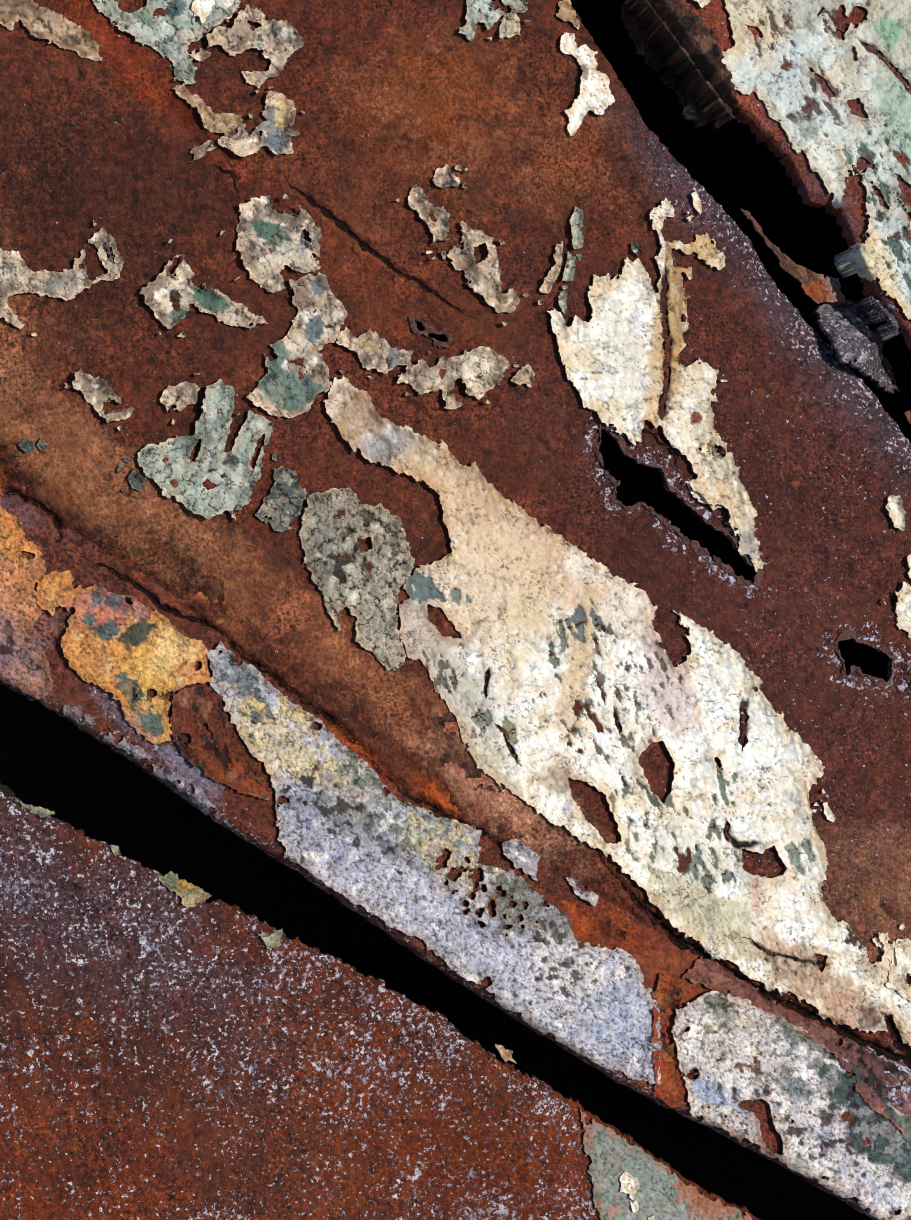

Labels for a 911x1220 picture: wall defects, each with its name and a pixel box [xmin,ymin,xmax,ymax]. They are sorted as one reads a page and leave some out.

peeling [92,0,305,162]
rust [621,0,740,130]
rust [739,209,846,304]
peeling [692,0,911,320]
crack [0,488,503,850]
rust [195,559,557,852]
crack [484,668,522,766]
peeling [117,164,911,1046]
crack [738,703,750,751]
peeling [0,505,911,1220]
crack [600,858,911,1070]
rust [650,956,911,1136]